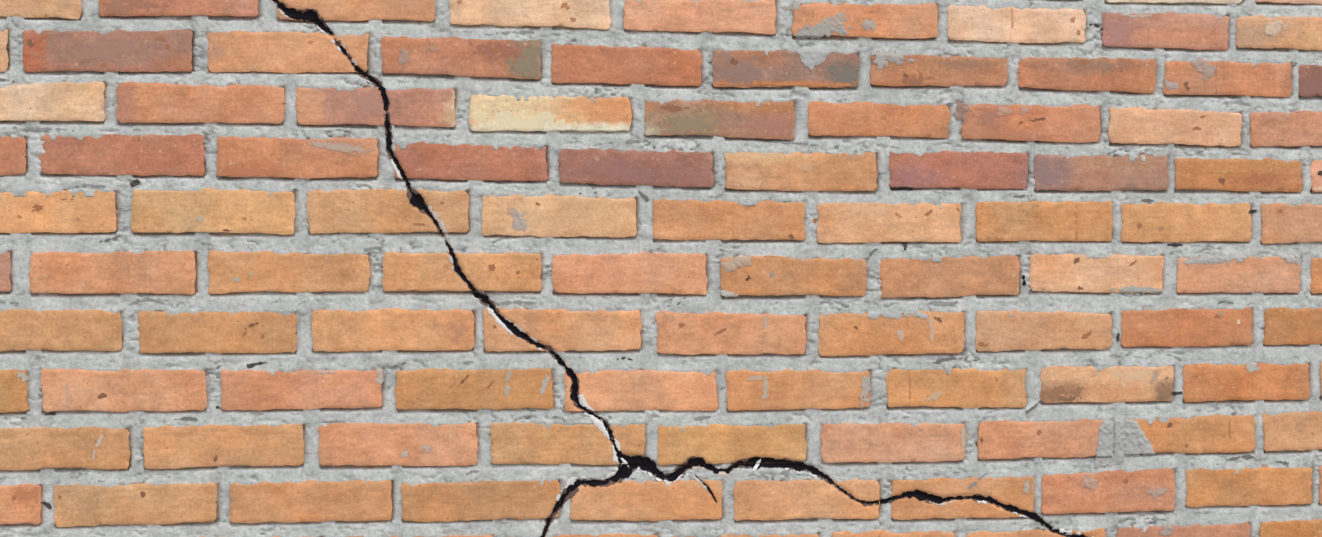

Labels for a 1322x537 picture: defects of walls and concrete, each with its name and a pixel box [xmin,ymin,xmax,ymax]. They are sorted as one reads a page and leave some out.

crack [271,0,1087,537]
crack [128,297,173,305]
crack [246,360,267,368]
crack [175,406,221,421]